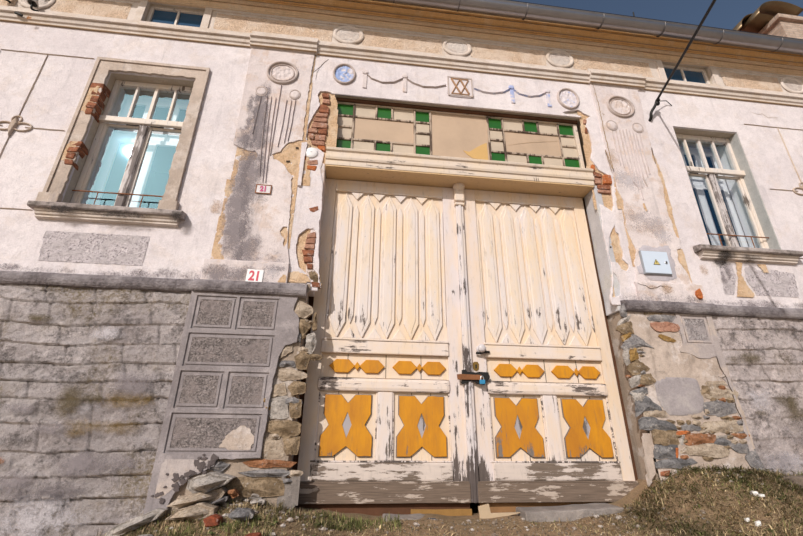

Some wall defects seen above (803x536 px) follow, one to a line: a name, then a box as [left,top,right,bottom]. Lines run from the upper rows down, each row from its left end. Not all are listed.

spalling [81,83,111,123]
spalling [61,141,89,171]
damp [241,87,270,205]
flaking render [577,111,636,271]
spalling [151,83,338,515]
flaking render [677,249,703,299]
damp [715,251,735,283]
peeling [735,262,755,297]
spalling [616,303,765,482]